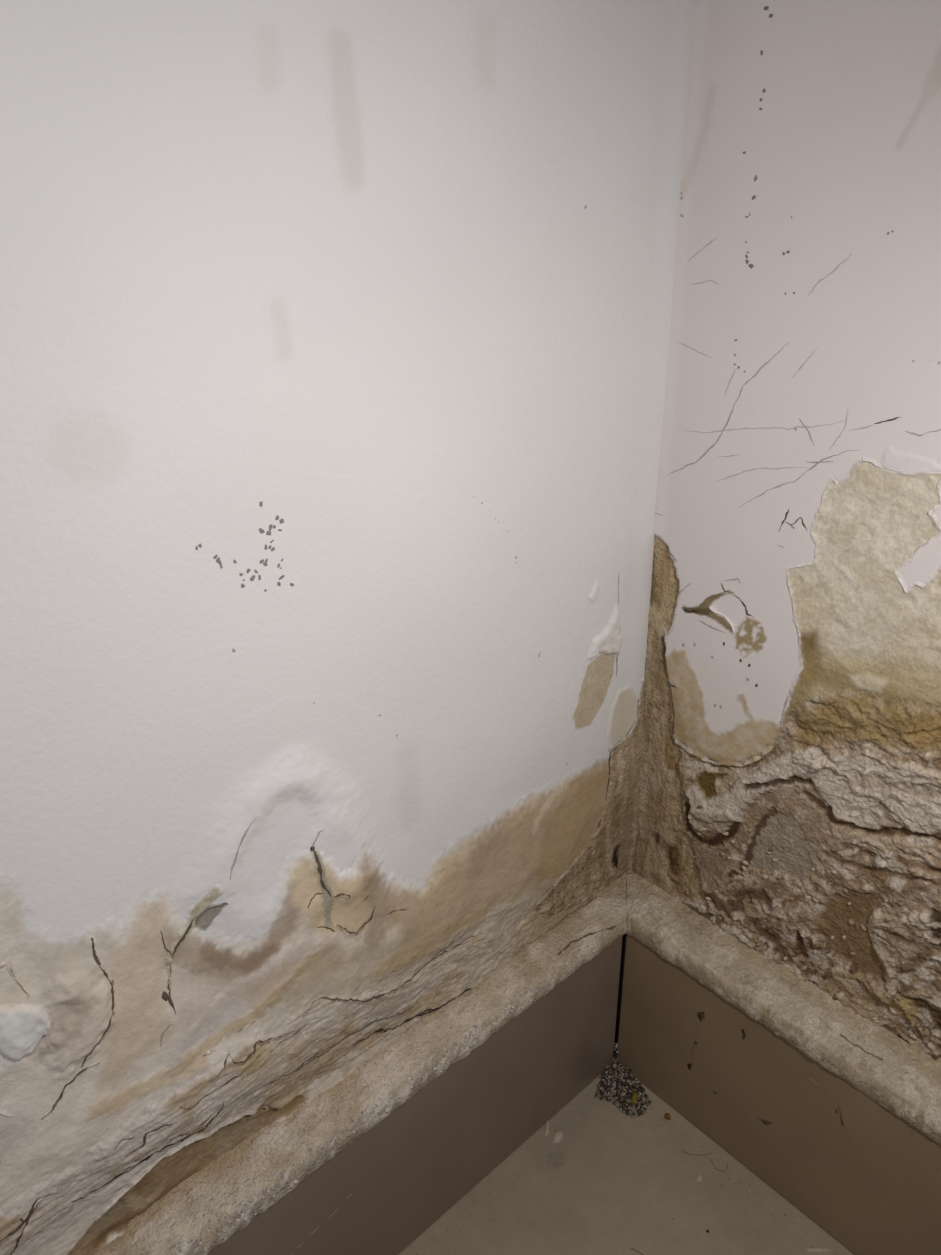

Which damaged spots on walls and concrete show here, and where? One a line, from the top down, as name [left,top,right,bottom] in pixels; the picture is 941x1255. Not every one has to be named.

crack [666,341,941,547]
damp [213,515,294,592]
crack [230,822,253,880]
damp [0,752,610,1215]
crack [307,829,407,938]
spalling [0,444,941,1255]
damp [15,1133,201,1255]
crack [0,928,483,1255]